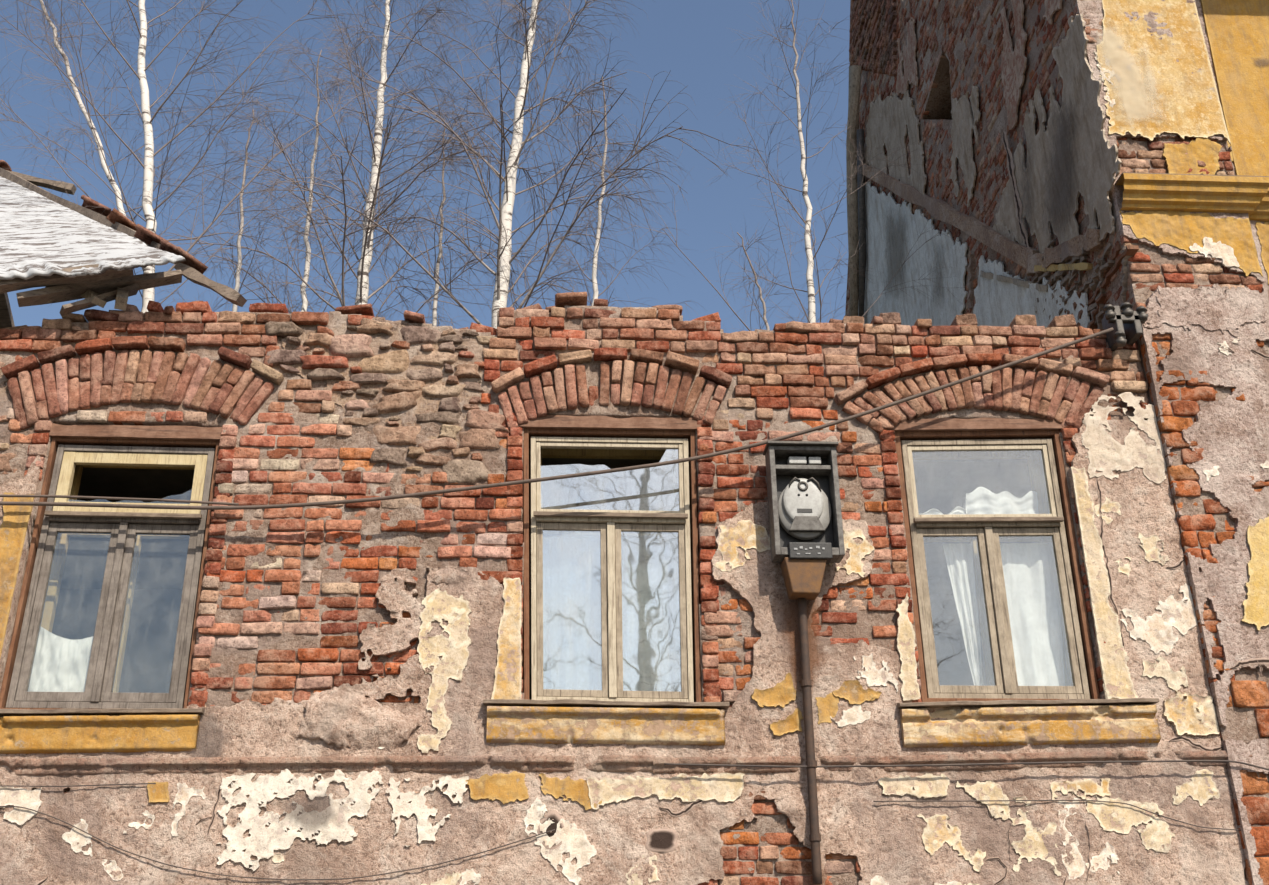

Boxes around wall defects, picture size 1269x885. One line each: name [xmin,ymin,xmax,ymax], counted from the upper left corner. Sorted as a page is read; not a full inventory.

flaking render [1073,0,1116,112]
spalling [1117,135,1234,175]
spalling [1081,234,1269,738]
peeling [714,520,771,572]
peeling [829,529,875,578]
spalling [192,648,371,704]
peeling [417,588,472,753]
peeling [751,653,898,736]
peeling [0,786,42,825]
peeling [123,782,206,836]
flaking render [216,768,889,885]
spalling [878,769,1269,885]